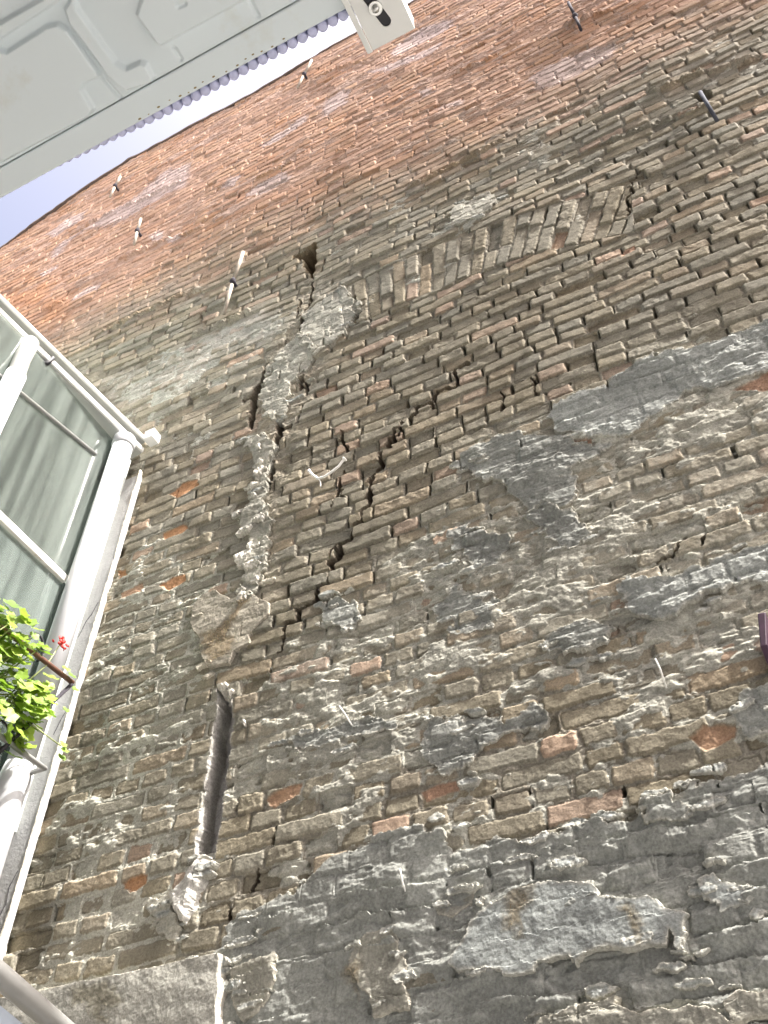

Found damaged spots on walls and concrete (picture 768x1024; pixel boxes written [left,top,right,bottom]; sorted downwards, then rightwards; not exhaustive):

crack [295,281,315,337]
spalling [709,371,768,393]
crack [241,361,293,489]
crack [276,360,471,655]
peeling [431,558,485,576]
peeling [473,590,498,610]
peeling [534,636,615,668]
peeling [449,707,487,736]
spalling [639,697,768,800]
spalling [421,770,481,832]
peeling [681,796,728,821]
flaking render [432,810,768,1024]